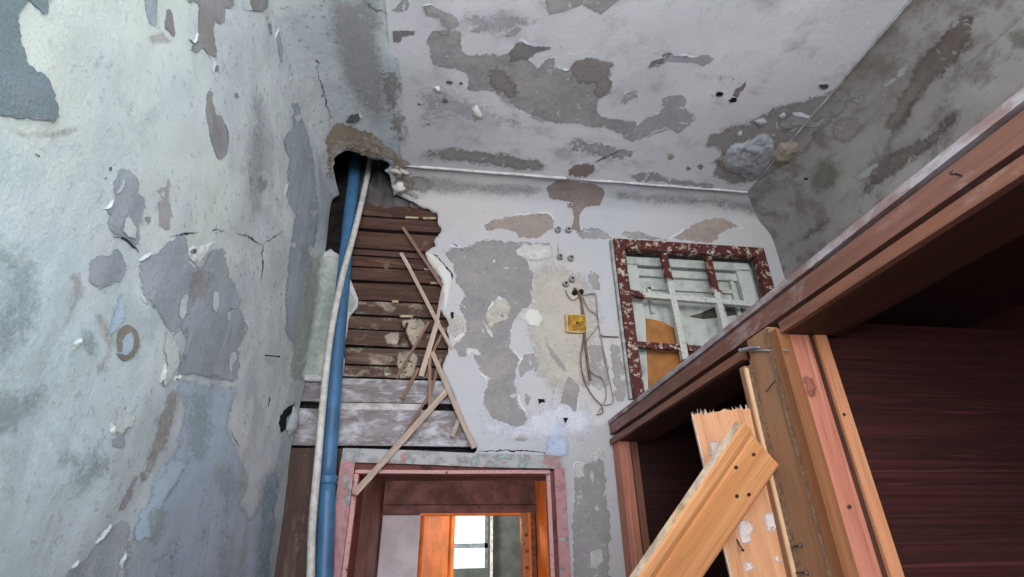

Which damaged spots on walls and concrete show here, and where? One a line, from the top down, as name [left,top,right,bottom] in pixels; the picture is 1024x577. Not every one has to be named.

peeling [0,0,59,123]
peeling [422,0,695,142]
peeling [653,51,713,67]
water stain [887,16,973,129]
flaking render [344,141,418,199]
peeling [754,112,826,133]
water stain [864,113,956,194]
peeling [104,167,250,386]
crack [172,229,284,280]
peeling [577,218,744,243]
peeling [426,212,554,441]
peeling [590,549,604,569]